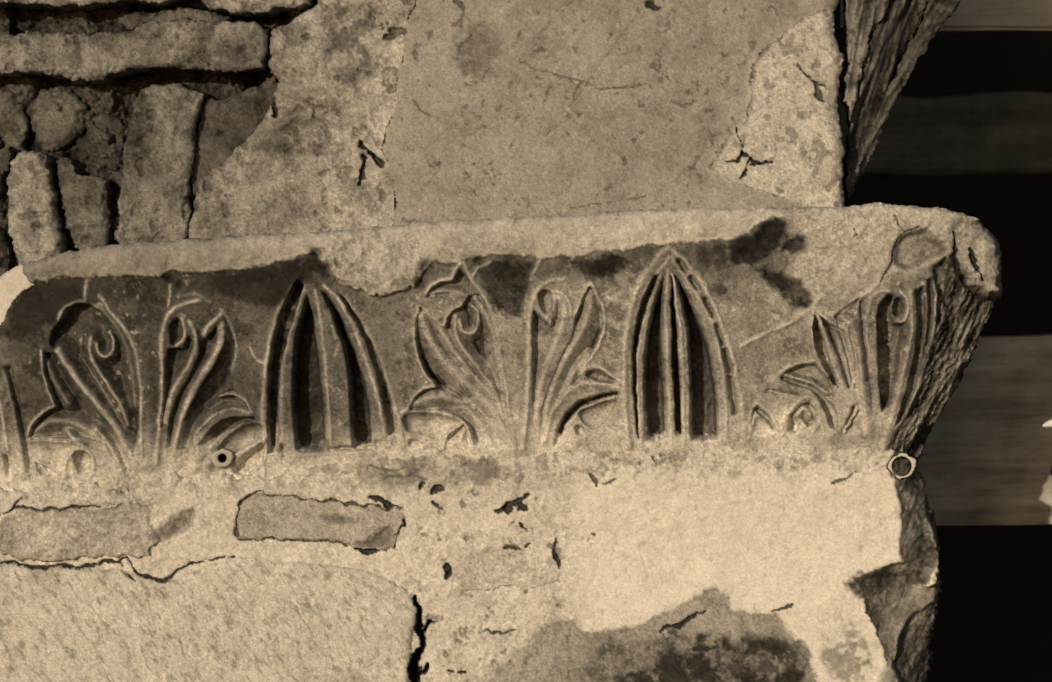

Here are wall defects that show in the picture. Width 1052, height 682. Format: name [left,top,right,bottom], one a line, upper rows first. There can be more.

crack [797,64,827,103]
peeling [187,0,429,298]
crack [727,128,774,180]
peeling [709,8,1002,315]
spalling [0,264,36,326]
crack [407,595,435,682]